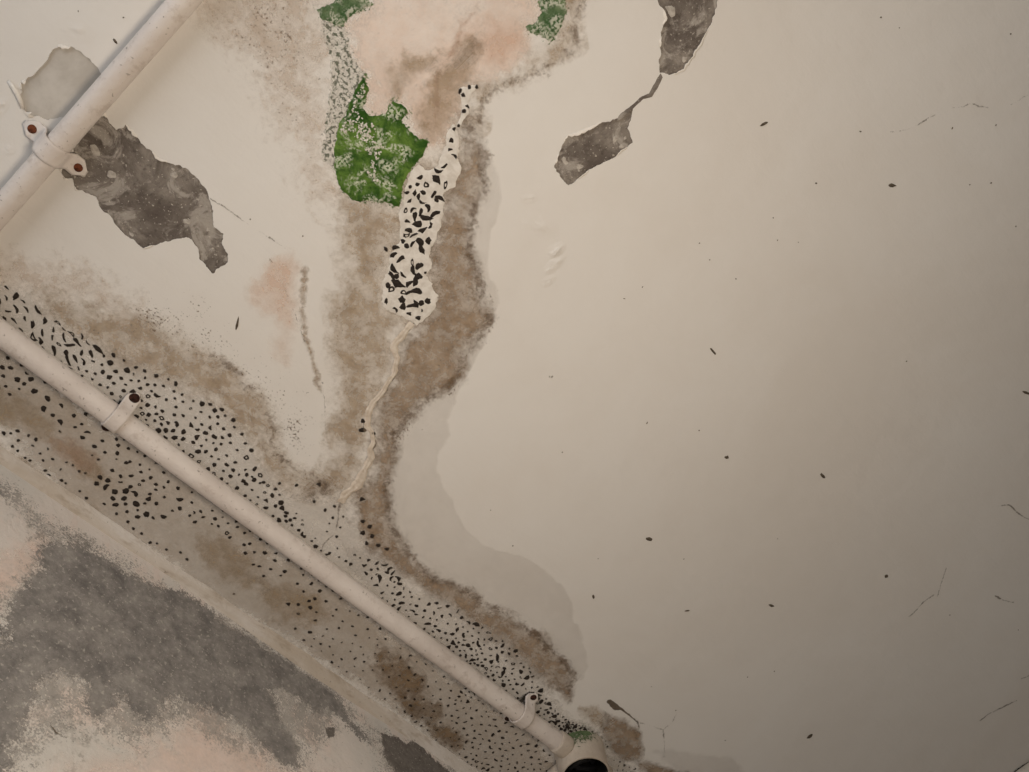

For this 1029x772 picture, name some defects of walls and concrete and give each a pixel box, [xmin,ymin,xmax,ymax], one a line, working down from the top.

spalling [7,44,101,120]
spalling [554,0,717,185]
spalling [59,113,228,273]
water stain [0,21,673,772]